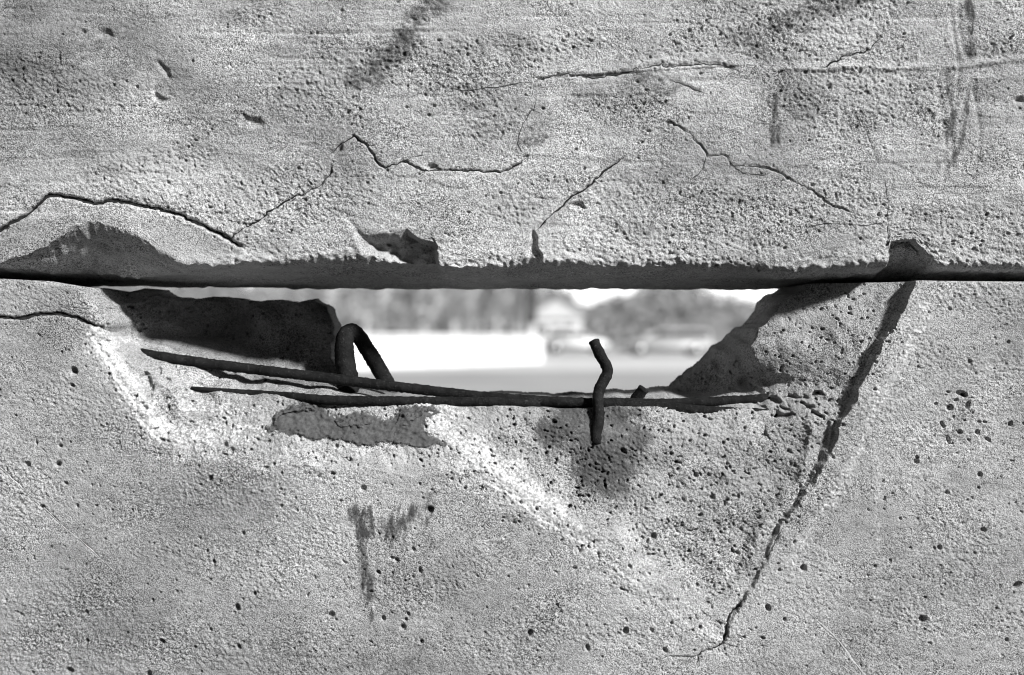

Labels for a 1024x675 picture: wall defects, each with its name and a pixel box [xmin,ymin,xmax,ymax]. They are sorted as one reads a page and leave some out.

water stain [965,0,976,56]
crack [0,63,744,247]
crack [656,118,889,254]
water stain [947,68,969,158]
spalling [339,212,441,266]
spalling [886,238,936,266]
crack [0,311,116,332]
spalling [1,226,915,642]
water stain [348,505,434,621]
crack [662,599,744,667]